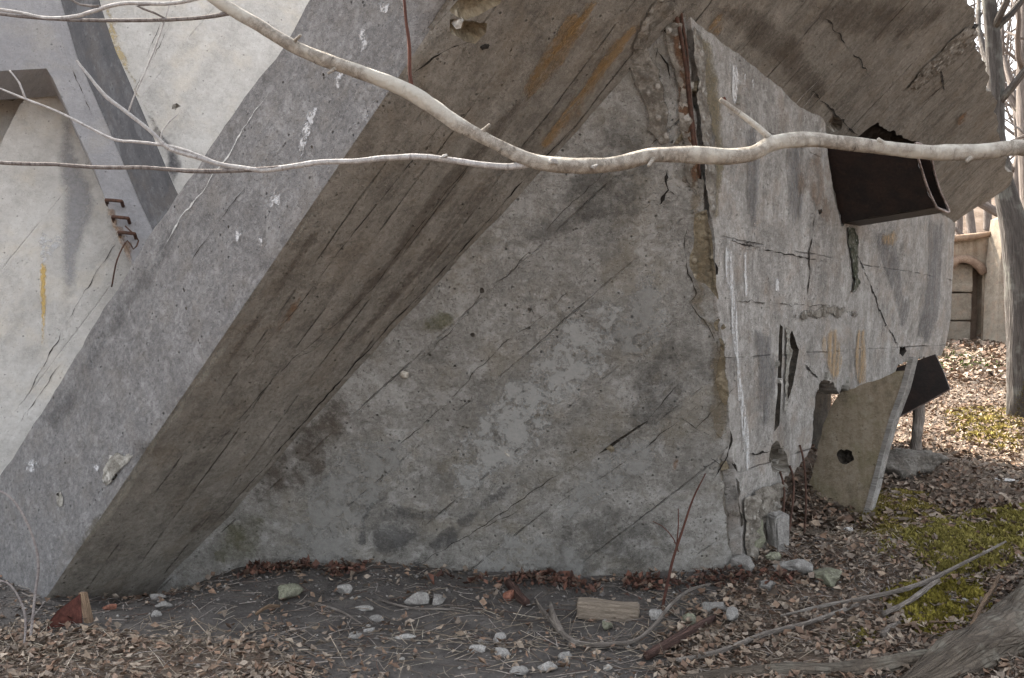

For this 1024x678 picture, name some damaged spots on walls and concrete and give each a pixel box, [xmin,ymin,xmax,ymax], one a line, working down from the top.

crack [816,5,868,74]
spalling [825,116,842,133]
spalling [859,123,919,144]
crack [647,173,679,207]
crack [734,222,830,307]
crack [858,257,900,351]
crack [413,389,768,567]
spalling [715,325,807,561]